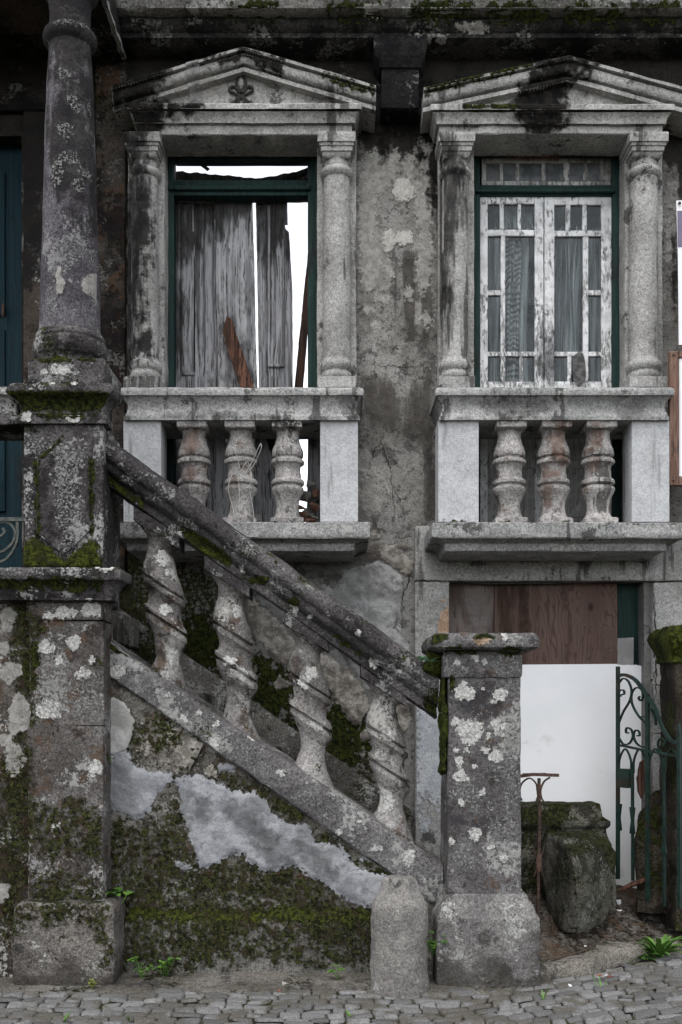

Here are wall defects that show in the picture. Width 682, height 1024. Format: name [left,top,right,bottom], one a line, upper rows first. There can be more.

damp [509,55,600,148]
damp [112,68,205,376]
damp [176,202,289,266]
damp [360,79,467,342]
crack [372,430,401,517]
spalling [320,653,371,742]
peeling [110,697,388,909]